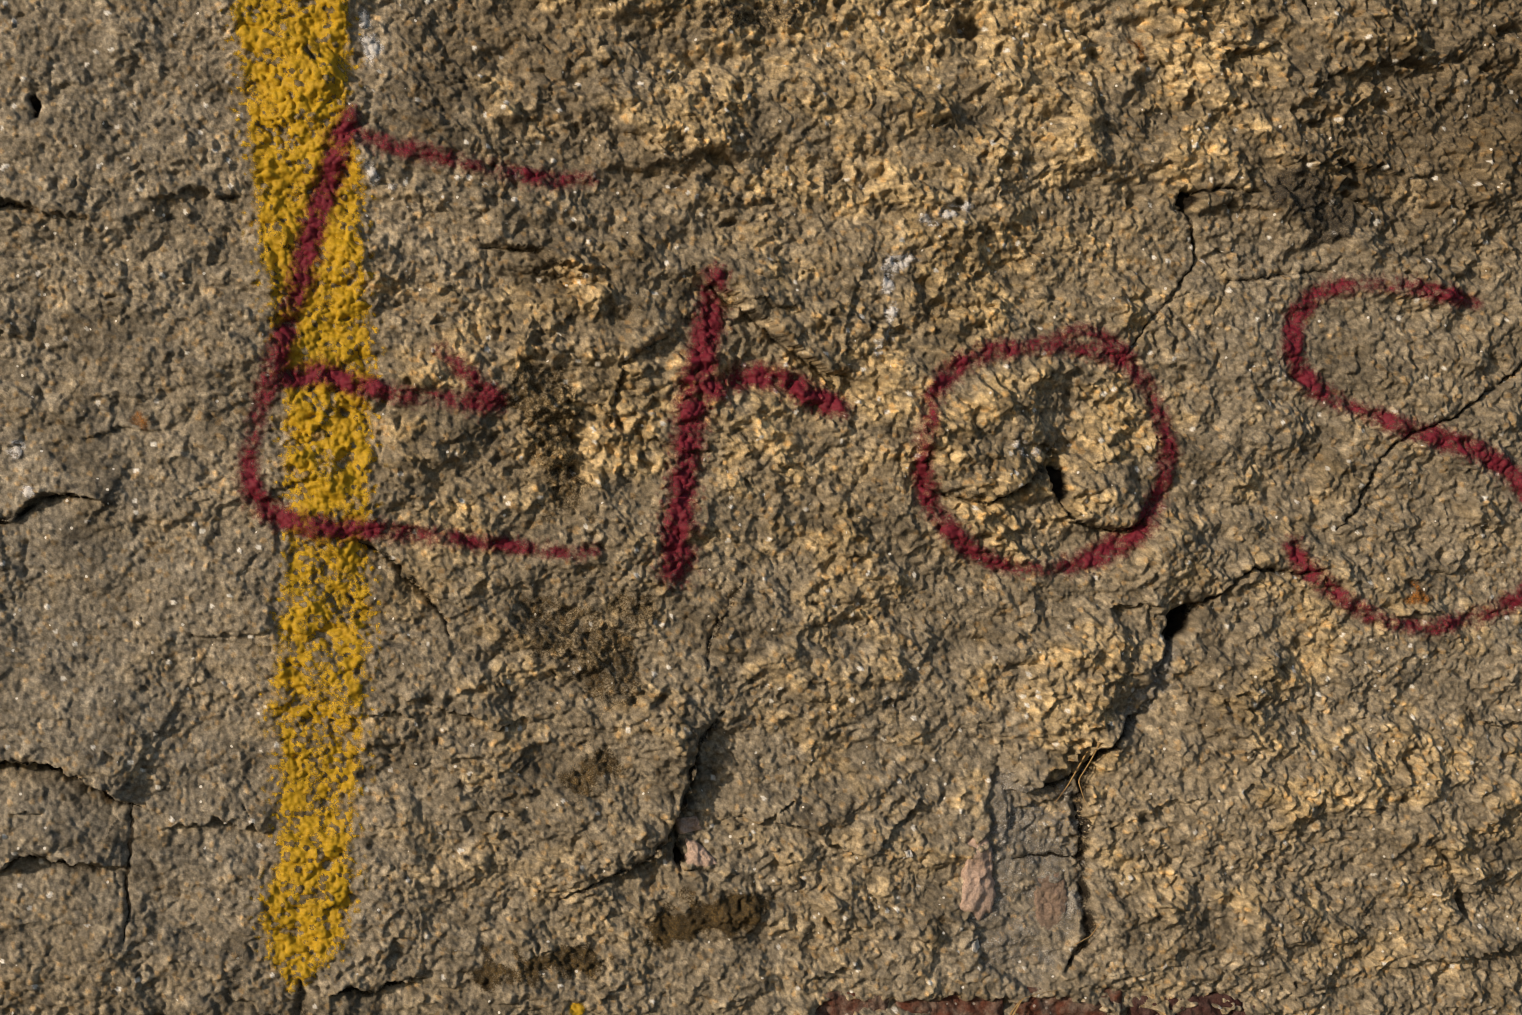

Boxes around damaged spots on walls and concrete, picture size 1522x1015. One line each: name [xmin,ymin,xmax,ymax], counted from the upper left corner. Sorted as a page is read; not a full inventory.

crack [1133,187,1255,345]
crack [1214,270,1326,312]
crack [923,486,1020,506]
crack [1336,363,1522,530]
crack [706,578,744,670]
crack [1156,567,1313,671]
crack [0,760,141,941]
crack [564,711,724,899]
crack [1013,718,1127,966]